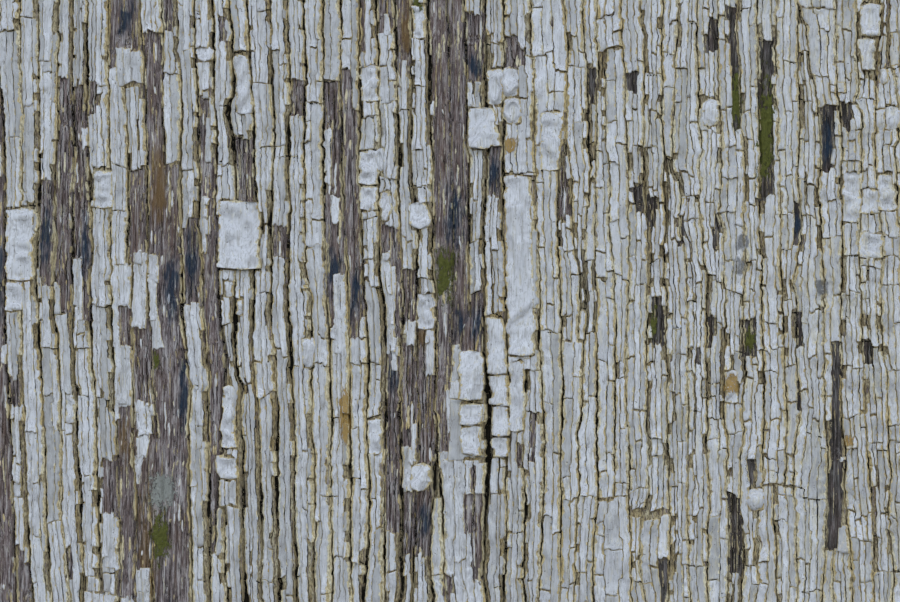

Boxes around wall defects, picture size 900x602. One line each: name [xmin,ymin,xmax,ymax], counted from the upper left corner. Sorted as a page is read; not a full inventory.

crack [0,0,158,602]
crack [161,0,444,602]
peeling [0,0,691,602]
crack [444,0,900,602]
peeling [673,0,900,602]